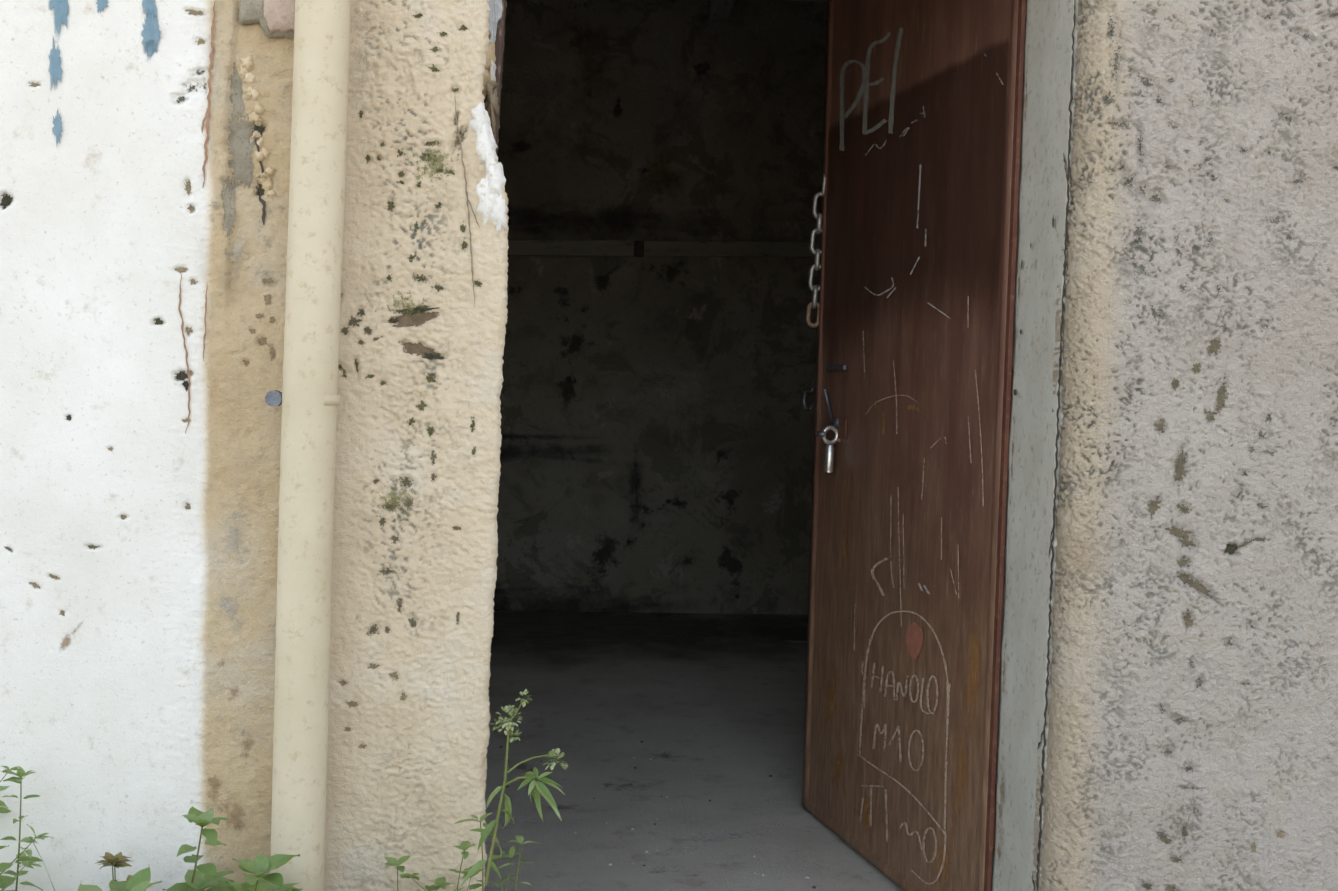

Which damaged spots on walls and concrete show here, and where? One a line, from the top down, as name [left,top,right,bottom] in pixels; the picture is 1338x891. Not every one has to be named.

flaking render [239,0,295,38]
crack [254,138,266,225]